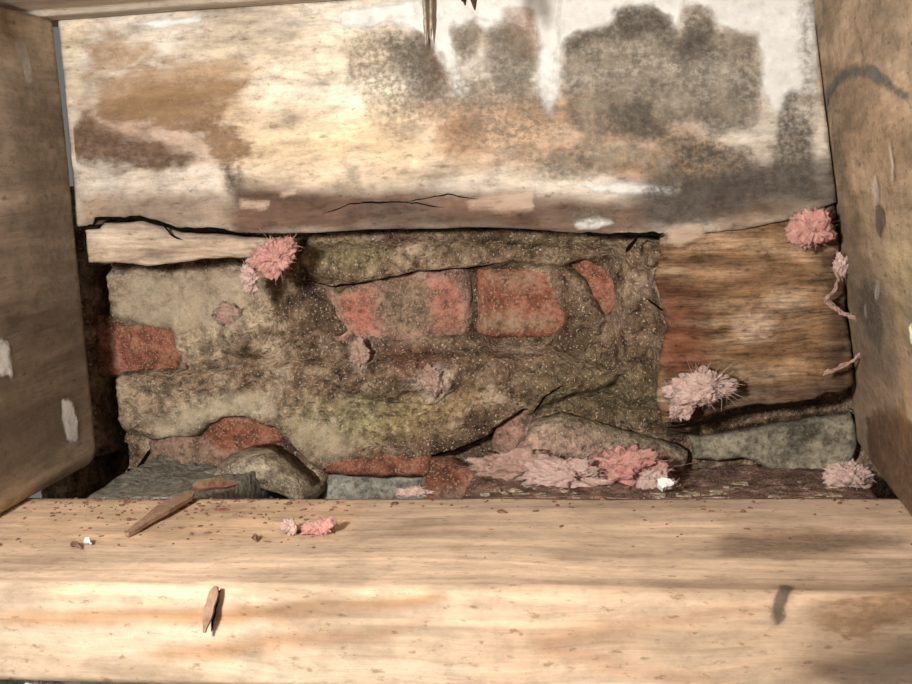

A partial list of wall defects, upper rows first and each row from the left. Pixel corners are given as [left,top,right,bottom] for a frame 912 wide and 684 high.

water stain [92,44,148,68]
mould [351,35,440,117]
mould [454,26,559,147]
water stain [825,66,905,105]
water stain [540,5,815,221]
water stain [15,65,249,302]
crack [82,215,238,240]
crack [528,385,564,415]
crack [431,433,493,456]